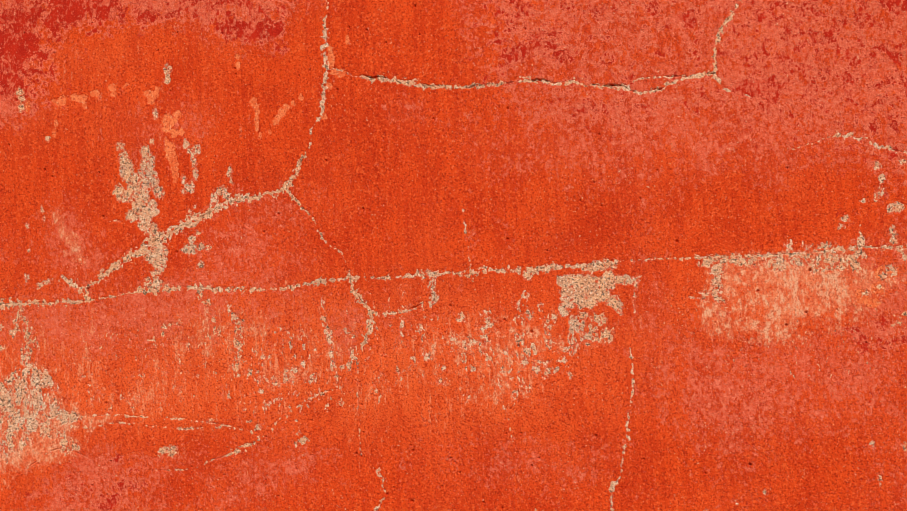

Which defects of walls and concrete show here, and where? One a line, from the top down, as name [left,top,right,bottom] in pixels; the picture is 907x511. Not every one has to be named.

peeling [112,63,234,291]
peeling [0,257,642,500]
crack [0,0,907,375]
crack [607,347,635,511]
peeling [671,160,907,379]